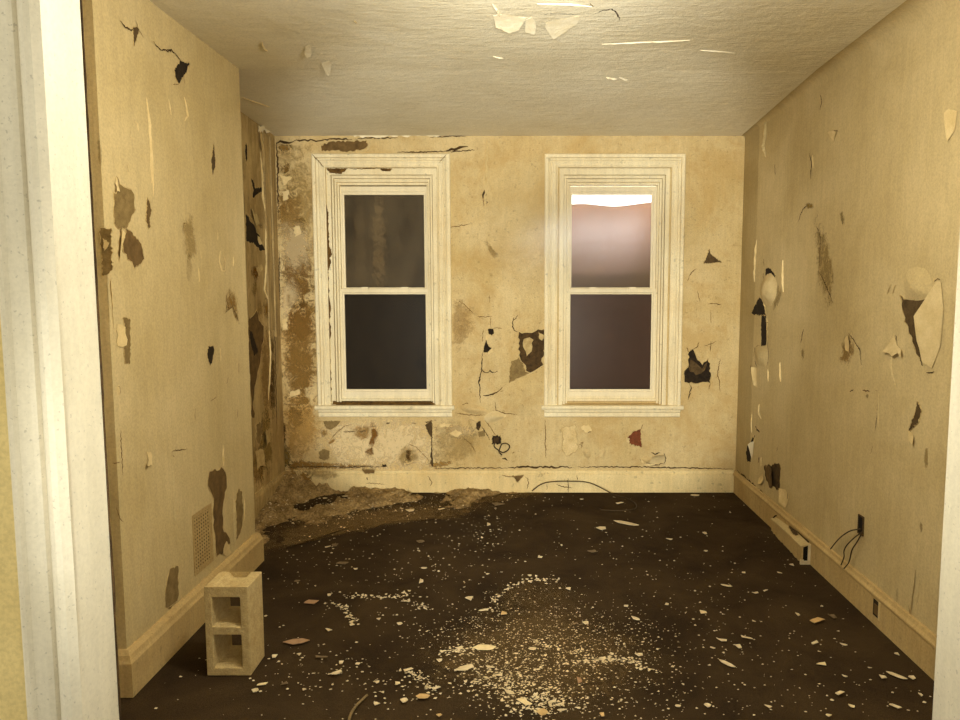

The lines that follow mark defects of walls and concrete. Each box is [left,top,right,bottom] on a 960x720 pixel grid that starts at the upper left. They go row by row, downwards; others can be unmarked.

peeling [492,3,620,40]
crack [122,22,185,85]
crack [276,136,473,215]
peeling [99,176,144,364]
crack [478,353,503,398]
flaking render [508,329,544,383]
hole [683,343,712,399]
peeling [914,281,944,368]
peeling [626,425,643,448]
peeling [748,405,789,508]
peeling [207,446,245,557]
peeling [164,565,179,610]